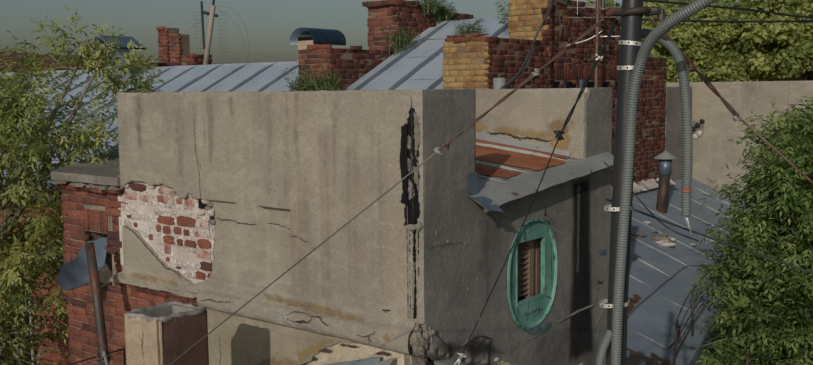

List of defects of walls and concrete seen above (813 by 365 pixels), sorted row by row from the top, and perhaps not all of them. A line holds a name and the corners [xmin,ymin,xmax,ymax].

crack [489,132,552,142]
corrosion [475,139,567,178]
flaking render [50,180,216,284]
crack [212,217,311,244]
flaking render [304,101,445,365]
crack [288,311,326,325]